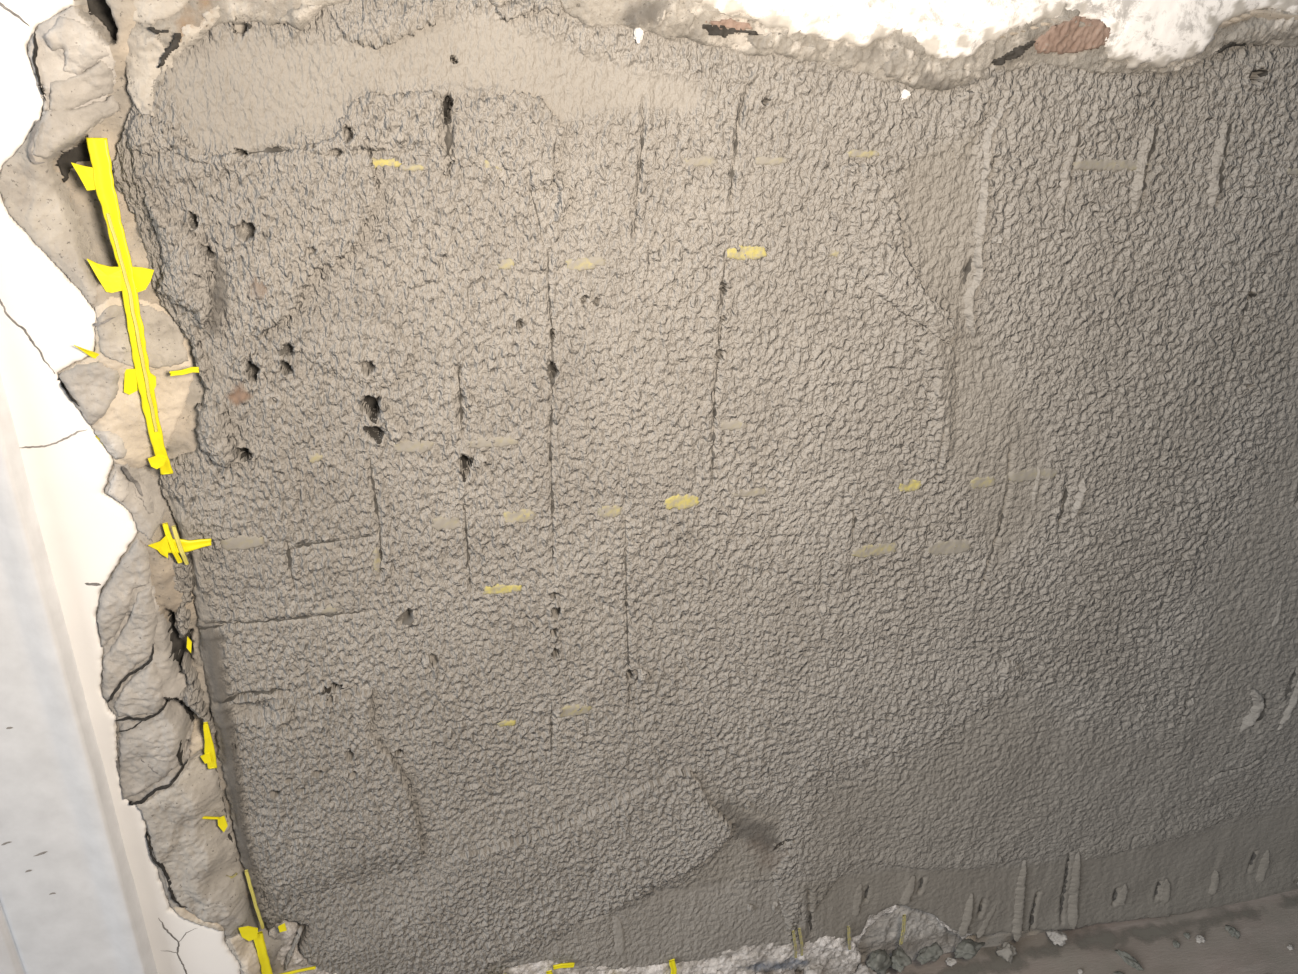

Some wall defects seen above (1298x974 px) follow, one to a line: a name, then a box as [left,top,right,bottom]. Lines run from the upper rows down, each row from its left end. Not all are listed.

crack [0,2,46,164]
crack [444,100,453,169]
spalling [560,0,1298,91]
crack [0,299,88,448]
crack [529,190,555,574]
crack [711,266,725,484]
spalling [0,0,345,974]
crack [218,688,290,703]
crack [107,644,237,974]
spalling [851,904,973,967]